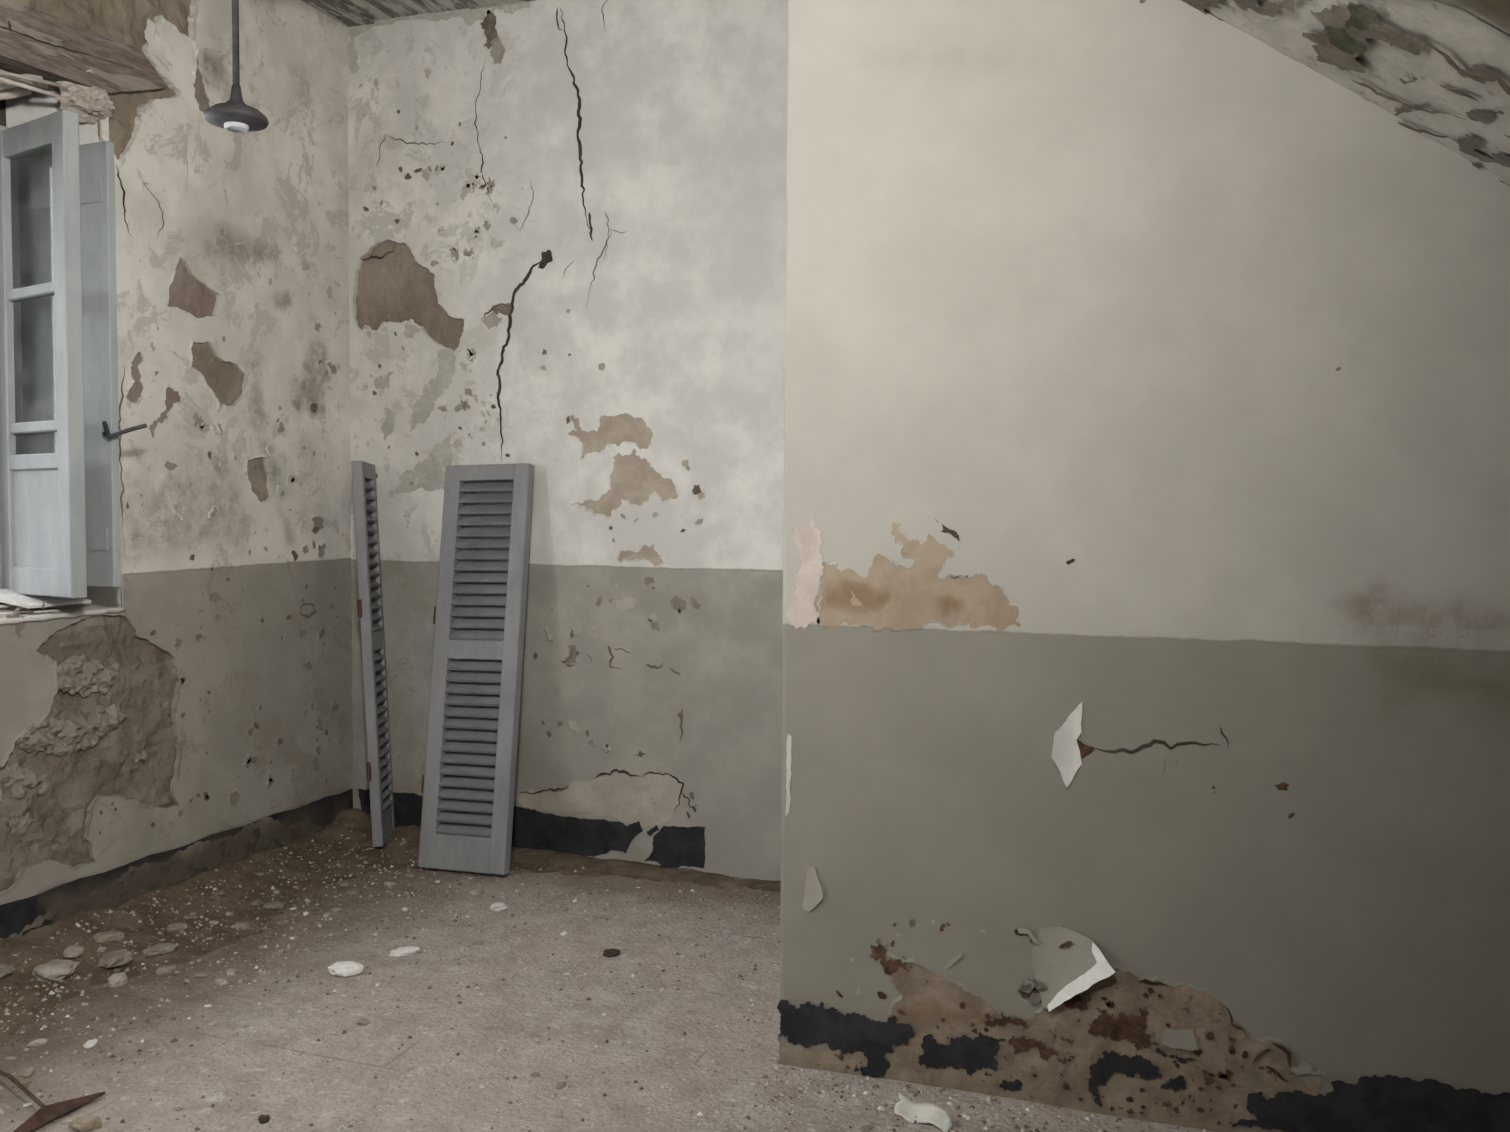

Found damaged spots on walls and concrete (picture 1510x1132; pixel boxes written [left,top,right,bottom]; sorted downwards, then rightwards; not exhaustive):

spalling [9,0,211,167]
peeling [1182,0,1426,73]
spalling [166,255,226,319]
spalling [269,122,518,497]
crack [377,8,627,460]
spalling [188,336,341,561]
peeling [566,412,705,632]
peeling [785,512,1021,633]
spalling [0,567,283,899]
peeling [516,720,699,827]
crack [1051,702,1229,788]
peeling [777,919,1329,1132]